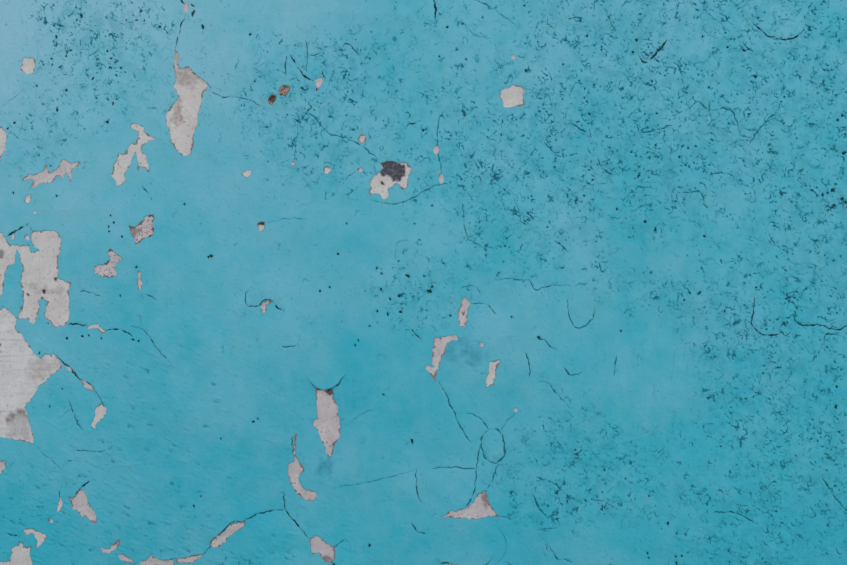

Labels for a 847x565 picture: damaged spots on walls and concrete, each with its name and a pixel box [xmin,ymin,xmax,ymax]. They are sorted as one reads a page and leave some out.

peeling [165,50,211,156]
peeling [500,85,525,108]
peeling [111,123,155,186]
peeling [369,161,412,199]
peeling [0,230,72,443]
peeling [425,297,471,381]
peeling [288,433,317,501]
peeling [307,372,345,457]
crack [341,381,515,510]
peeling [442,491,499,520]
crack [533,476,613,530]
peeling [0,528,47,565]